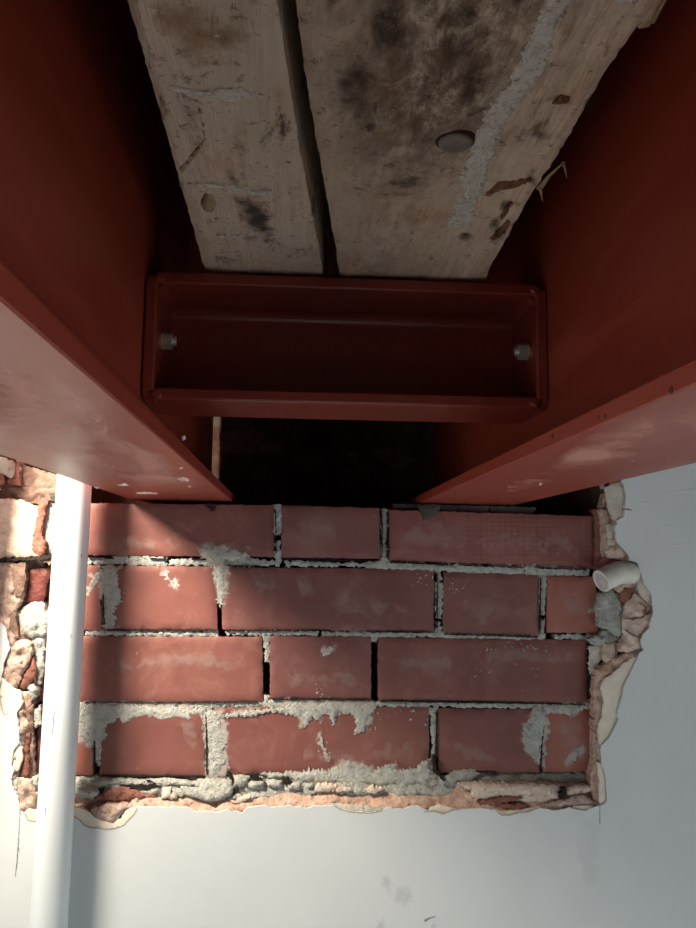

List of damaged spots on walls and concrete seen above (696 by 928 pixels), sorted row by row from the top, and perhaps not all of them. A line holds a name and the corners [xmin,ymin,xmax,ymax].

damp [447,0,575,229]
spalling [0,457,57,822]
spalling [74,480,652,830]